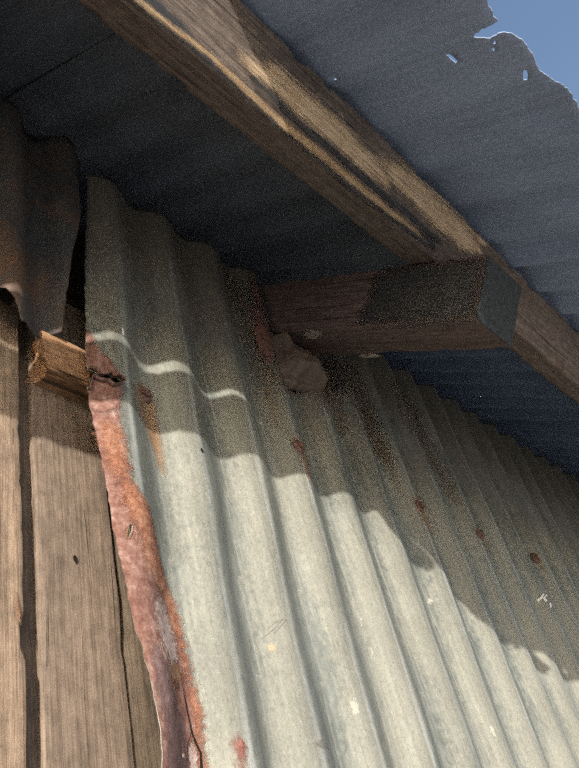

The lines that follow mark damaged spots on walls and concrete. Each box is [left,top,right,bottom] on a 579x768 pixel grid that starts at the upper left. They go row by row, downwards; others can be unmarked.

rust [87,380,206,768]
crack [181,677,203,768]
rust [232,737,245,765]